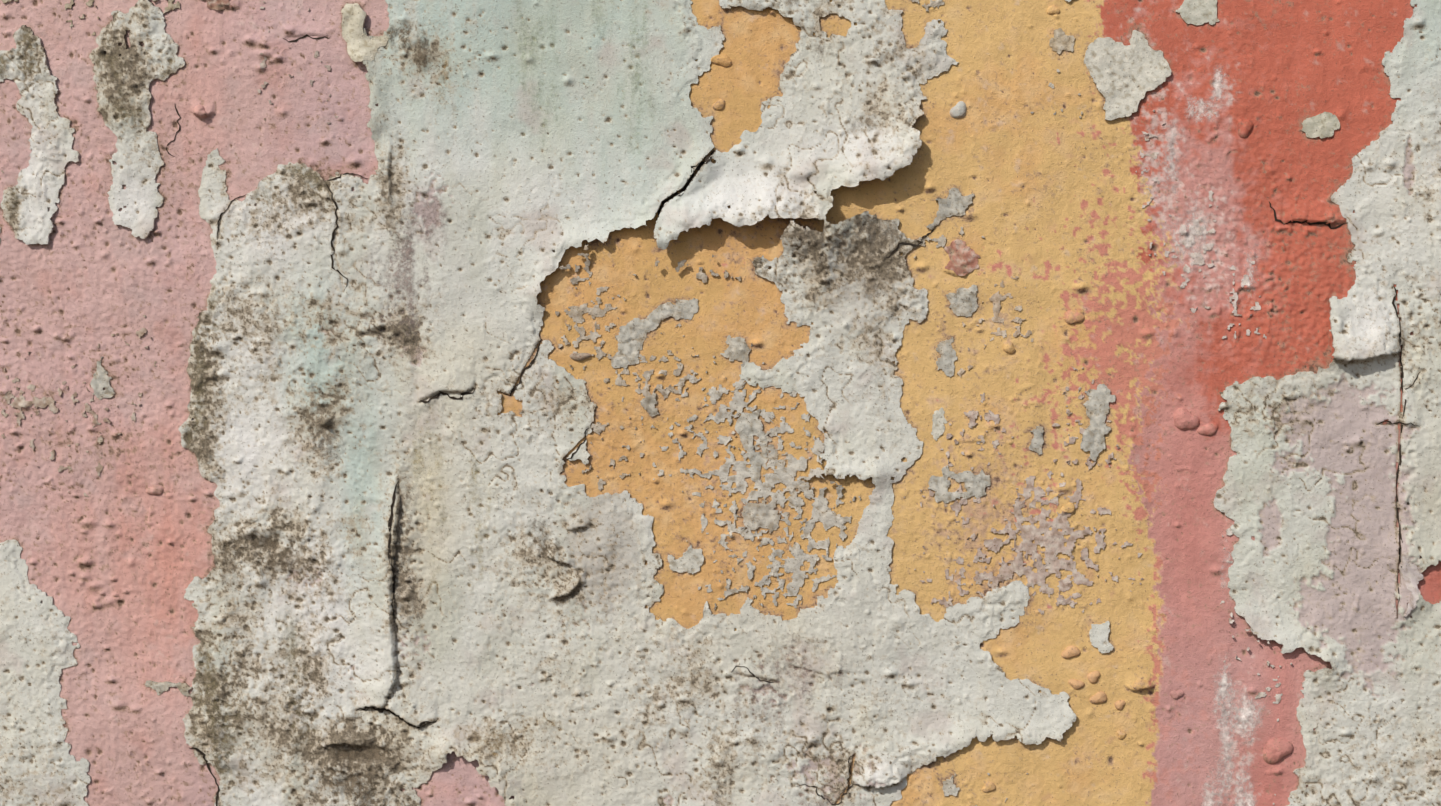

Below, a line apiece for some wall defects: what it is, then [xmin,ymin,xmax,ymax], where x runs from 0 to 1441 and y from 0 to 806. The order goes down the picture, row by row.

peeling [0,25,80,245]
peeling [89,0,185,239]
peeling [1084,30,1172,121]
peeling [1175,0,1220,26]
peeling [0,539,91,806]
crack [388,481,399,619]
crack [356,706,437,728]
damp [393,485,422,619]
peeling [178,0,1076,806]
peeling [1089,621,1114,653]
peeling [1213,0,1441,806]
crack [1378,286,1421,607]